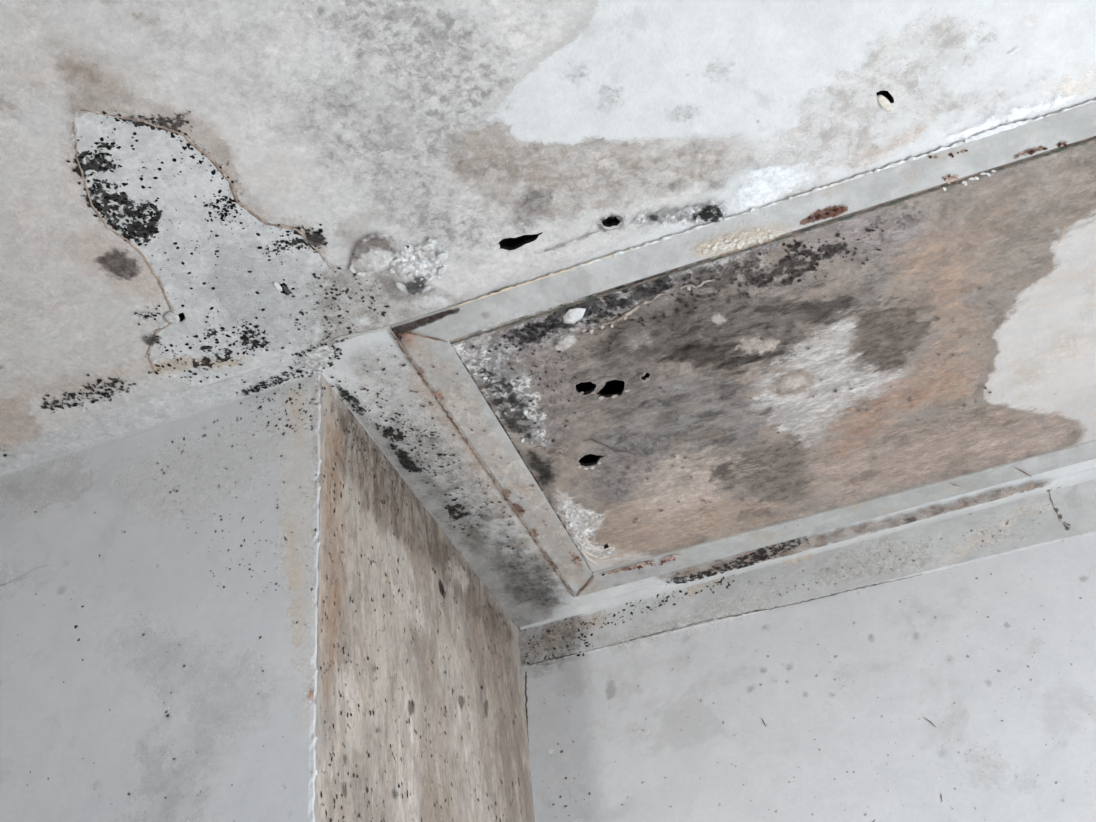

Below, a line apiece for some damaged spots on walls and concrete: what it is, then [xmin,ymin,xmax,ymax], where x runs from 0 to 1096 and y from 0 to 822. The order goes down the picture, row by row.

spalling [73,110,352,387]
leakage [0,0,738,293]
hole [500,235,536,247]
leakage [455,136,1096,558]
corrosion [800,206,848,225]
corrosion [1015,142,1067,158]
leakage [0,264,1051,822]